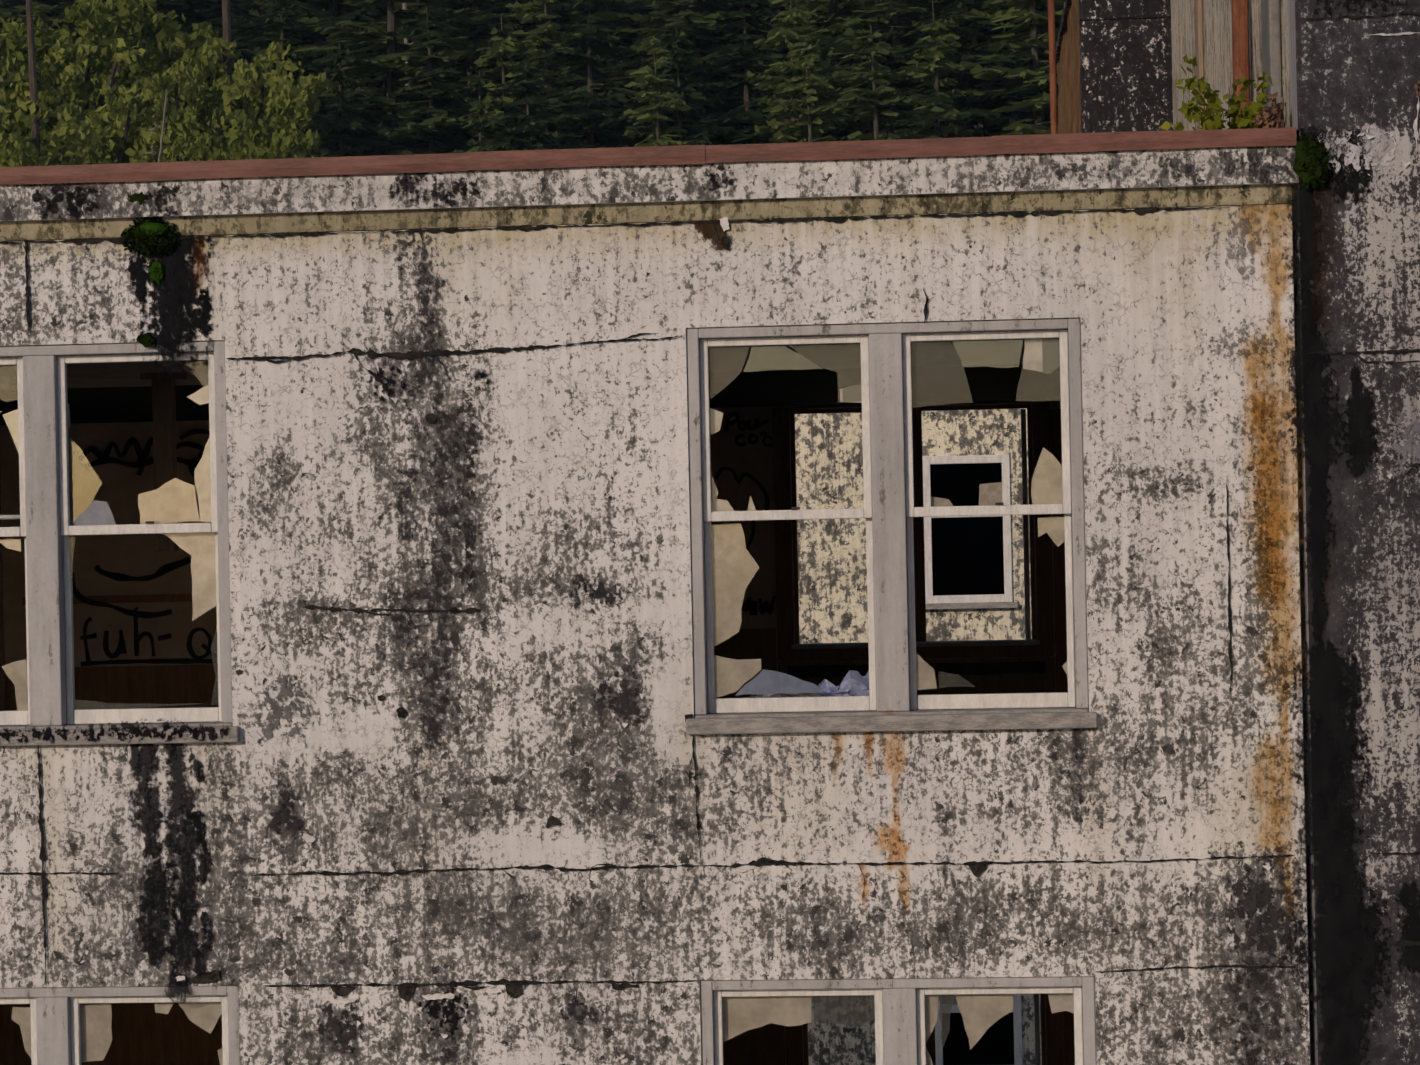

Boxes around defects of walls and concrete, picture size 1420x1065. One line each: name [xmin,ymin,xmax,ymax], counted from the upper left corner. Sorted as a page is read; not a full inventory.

damp [29,183,99,221]
damp [388,172,480,207]
damp [125,235,216,376]
crack [227,333,682,391]
crack [304,605,481,616]
damp [367,229,483,749]
rust [1241,204,1305,850]
damp [1158,124,1420,1065]
damp [0,718,234,1005]
crack [251,735,1294,900]
rust [866,732,909,909]
crack [1368,852,1420,860]